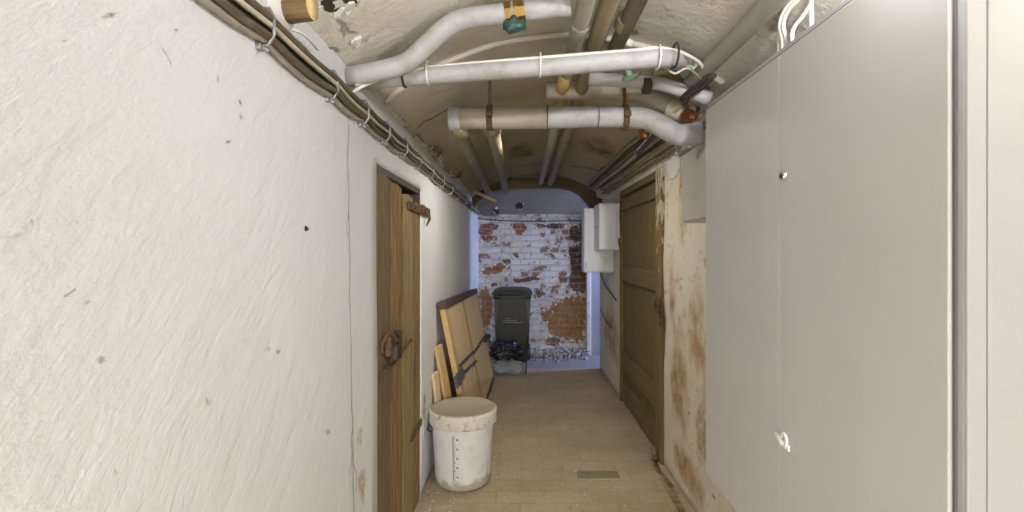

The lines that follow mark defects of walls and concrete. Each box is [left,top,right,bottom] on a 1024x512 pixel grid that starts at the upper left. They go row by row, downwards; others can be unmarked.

flaking render [317,0,364,18]
flaking render [478,202,586,347]